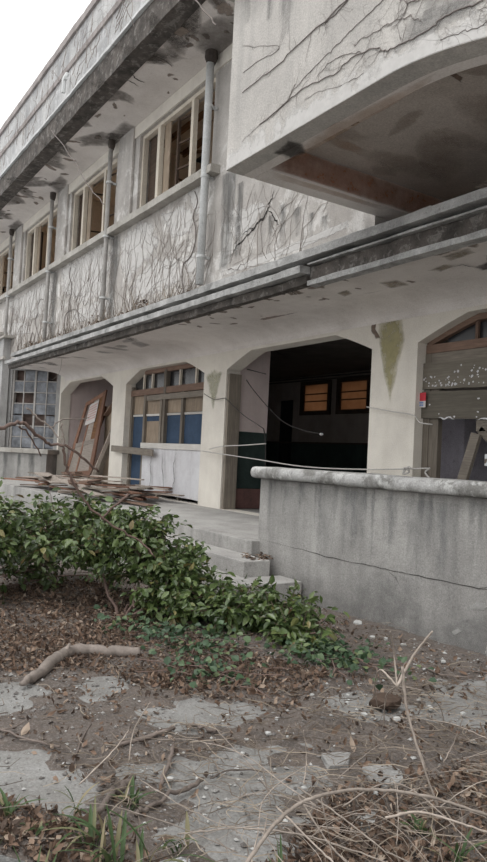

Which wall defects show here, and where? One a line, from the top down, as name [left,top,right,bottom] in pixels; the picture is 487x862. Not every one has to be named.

damp [198,21,233,52]
rust [286,153,444,212]
damp [380,321,402,387]
crack [265,540,487,589]